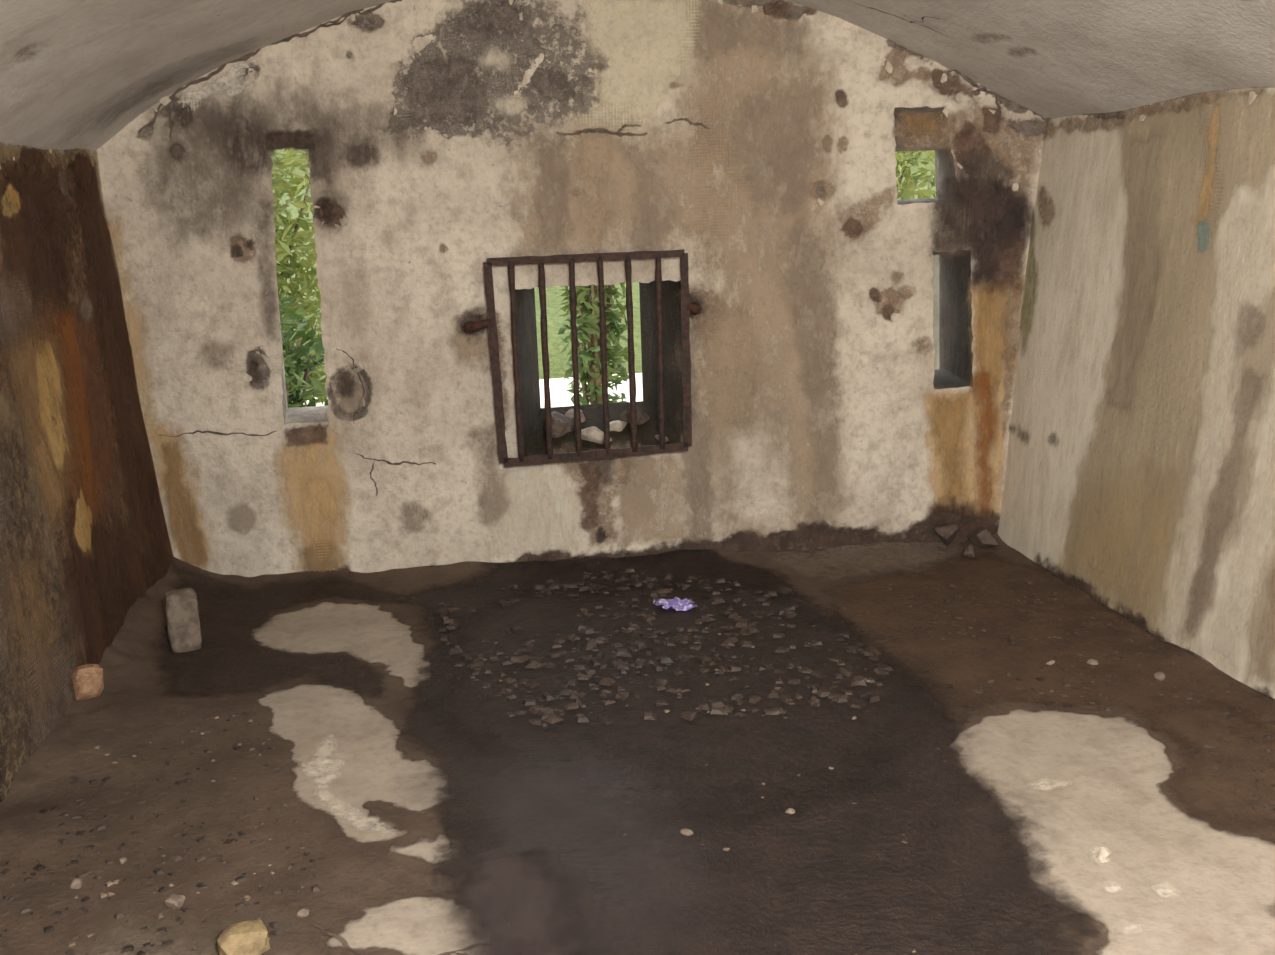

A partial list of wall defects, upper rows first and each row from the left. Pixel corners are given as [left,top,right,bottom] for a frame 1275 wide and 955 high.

crack [556,118,710,137]
peeling [880,39,1220,224]
leakage [517,1,837,545]
leakage [0,390,76,799]
crack [158,429,276,437]
rust [280,424,347,572]
crack [355,453,436,496]
leakage [160,90,1275,955]
rust [927,268,1024,520]